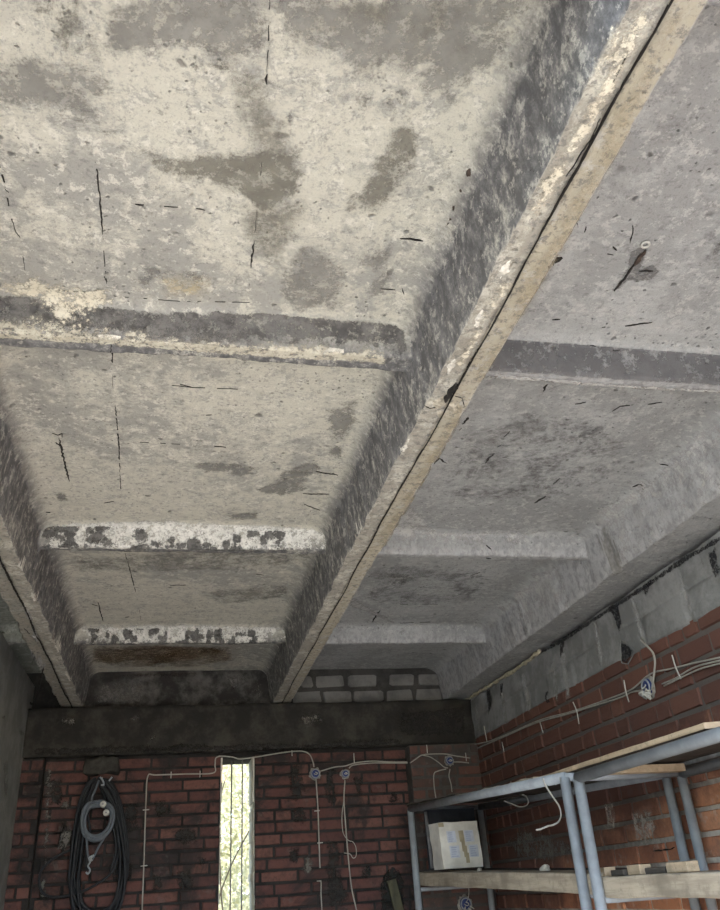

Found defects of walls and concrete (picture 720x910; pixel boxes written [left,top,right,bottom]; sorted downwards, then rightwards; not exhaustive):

crack [263,0,271,85]
water stain [149,80,305,255]
water stain [347,129,417,211]
crack [95,162,107,284]
water stain [0,248,407,355]
crack [282,0,674,703]
crack [52,433,70,482]
crack [105,344,180,503]
water stain [258,464,319,495]
peeling [42,521,326,551]
rust [94,645,231,677]
peeling [83,625,286,644]